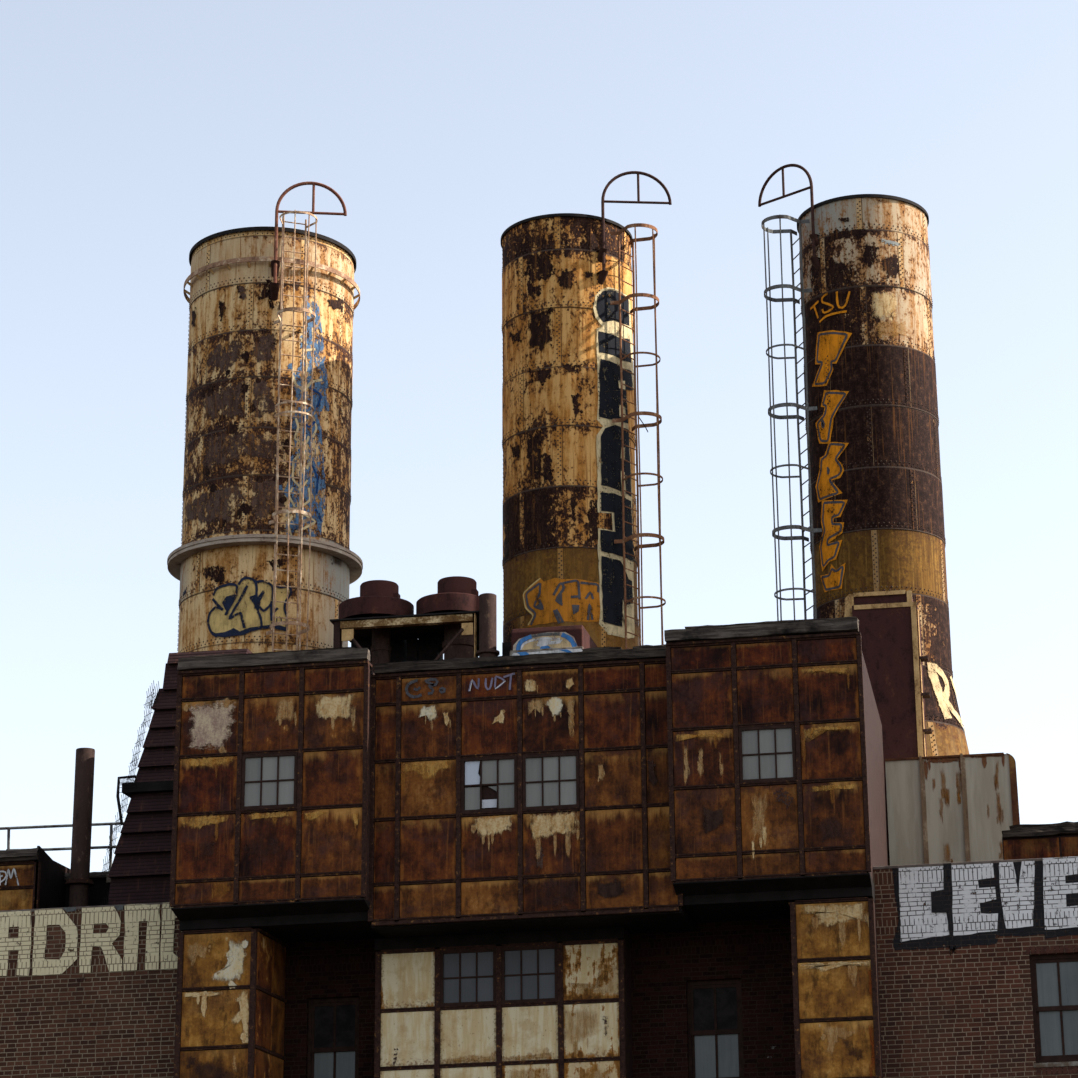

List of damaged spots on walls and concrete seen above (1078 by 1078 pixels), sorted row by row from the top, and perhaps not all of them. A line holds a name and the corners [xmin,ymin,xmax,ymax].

rust [807,217,900,291]
rust [327,298,344,312]
rust [510,250,593,352]
rust [185,329,294,527]
rust [505,427,611,561]
peeling [184,698,236,753]
peeling [316,695,355,729]
peeling [525,678,574,733]
rust [924,755,1005,823]
peeling [471,816,512,850]
peeling [530,812,579,856]
peeling [184,940,249,1043]